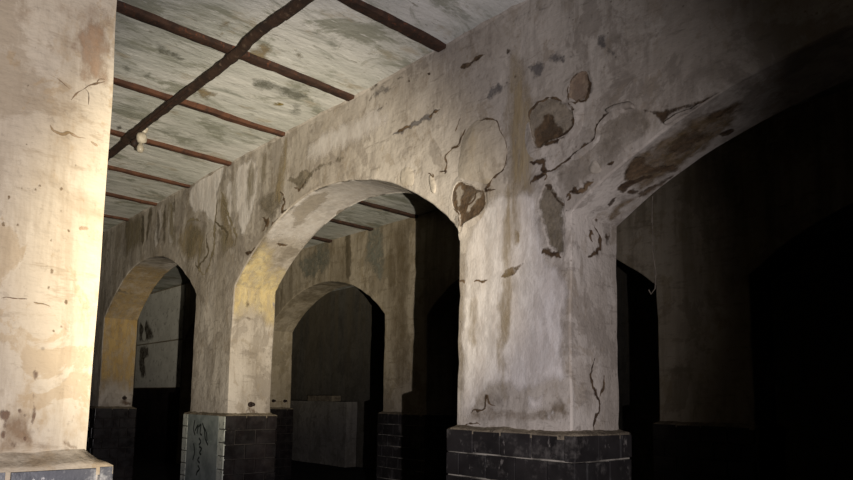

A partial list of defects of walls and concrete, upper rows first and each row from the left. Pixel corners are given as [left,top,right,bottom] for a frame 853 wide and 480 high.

crack [50,125,98,146]
crack [57,78,105,105]
rust [131,90,190,136]
flaking render [524,66,596,160]
crack [528,101,635,201]
peeling [448,176,573,413]
crack [590,359,605,427]